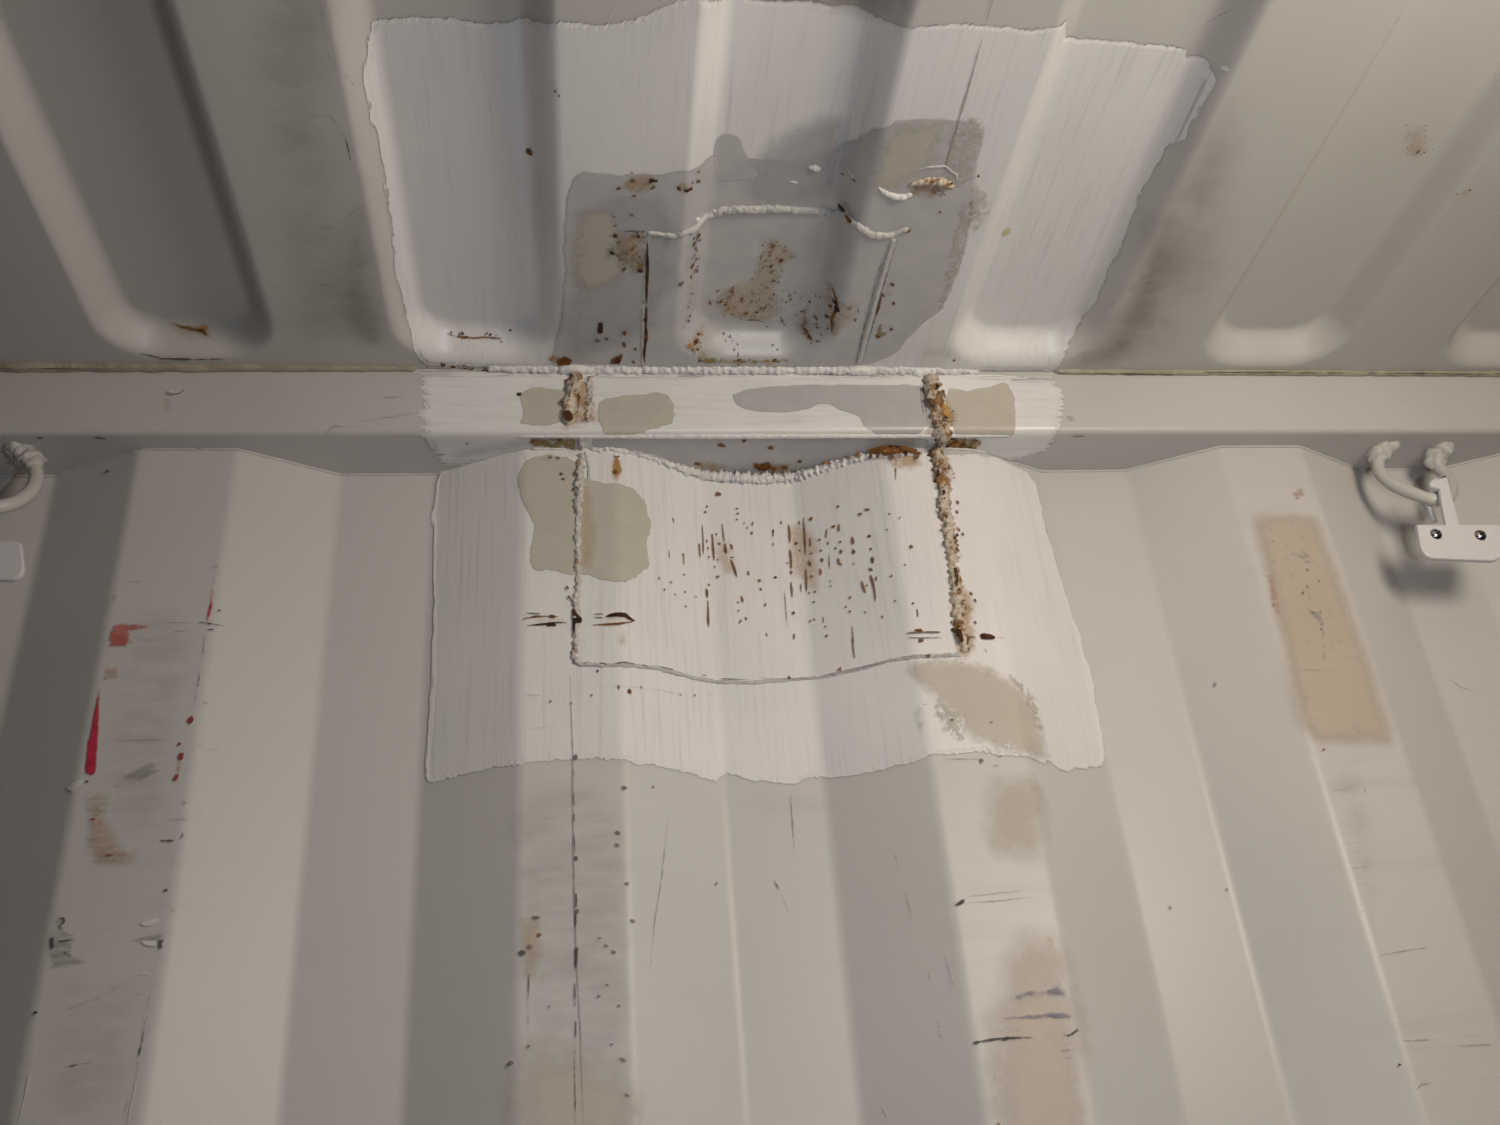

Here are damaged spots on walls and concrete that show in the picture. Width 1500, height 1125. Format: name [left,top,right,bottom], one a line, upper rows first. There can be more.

corrosion [549,357,572,366]
corrosion [678,233,895,366]
corrosion [530,439,577,491]
corrosion [821,445,922,478]
corrosion [659,492,918,671]
corrosion [939,438,987,650]